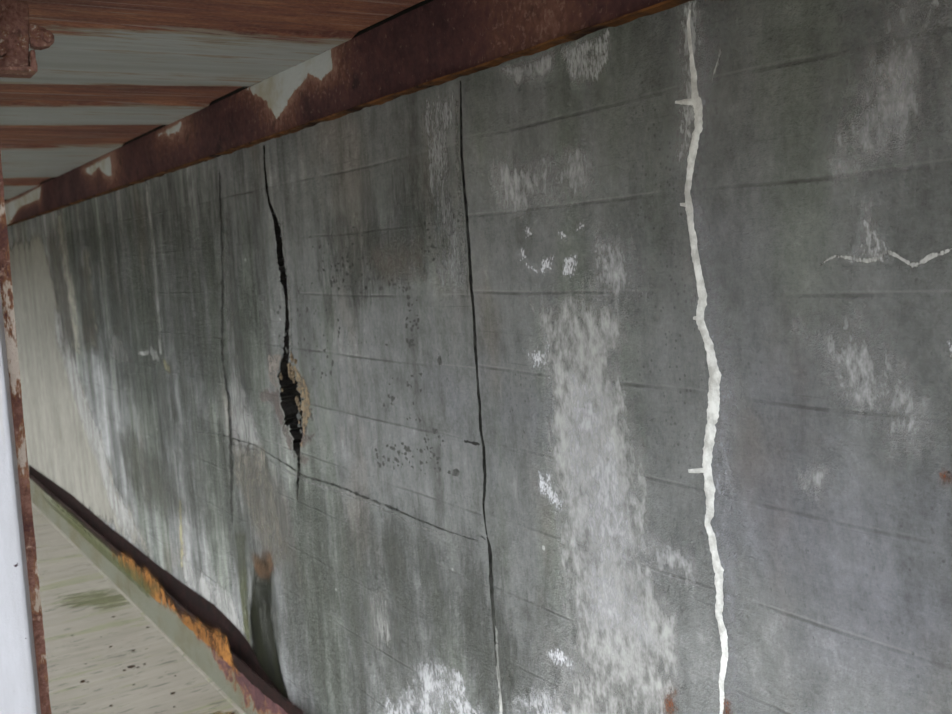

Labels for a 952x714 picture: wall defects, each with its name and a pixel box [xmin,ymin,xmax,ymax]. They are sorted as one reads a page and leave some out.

rust [29,473,305,714]
crack [194,81,503,714]
rust [7,0,694,226]
leakage [516,297,692,714]
leakage [596,240,627,297]
crack [675,1,728,714]